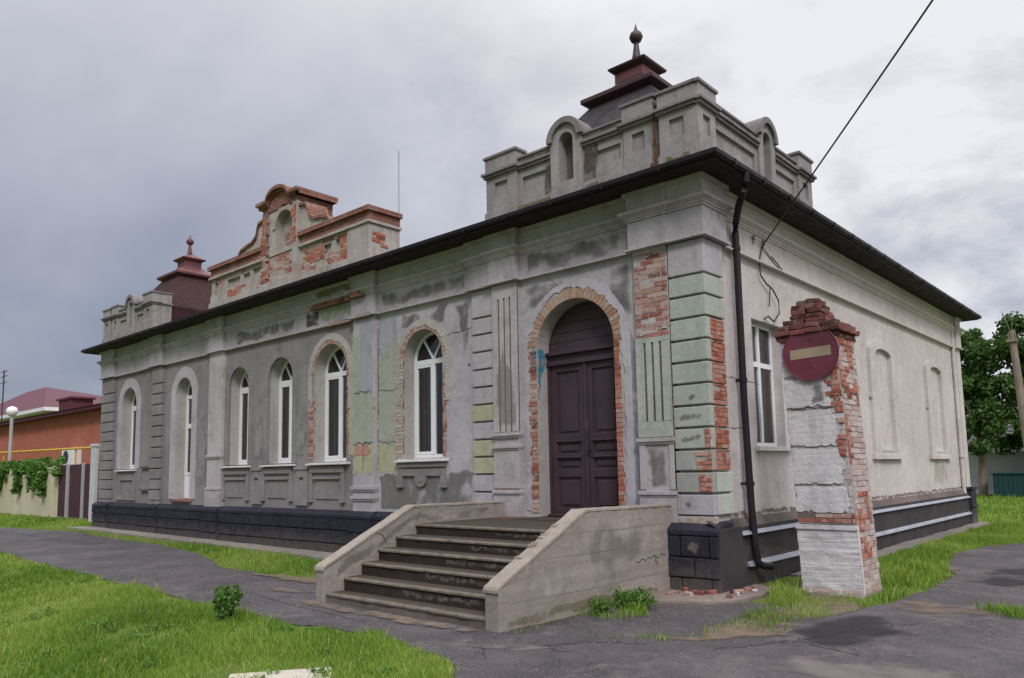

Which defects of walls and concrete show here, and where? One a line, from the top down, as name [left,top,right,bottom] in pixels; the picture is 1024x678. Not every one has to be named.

rust [650,120,659,167]
flaking render [216,204,347,298]
flaking render [372,228,388,249]
peeling [308,312,451,475]
flaking render [522,251,671,513]
flaking render [696,316,731,492]
flaking render [824,336,860,463]
crack [512,523,666,604]